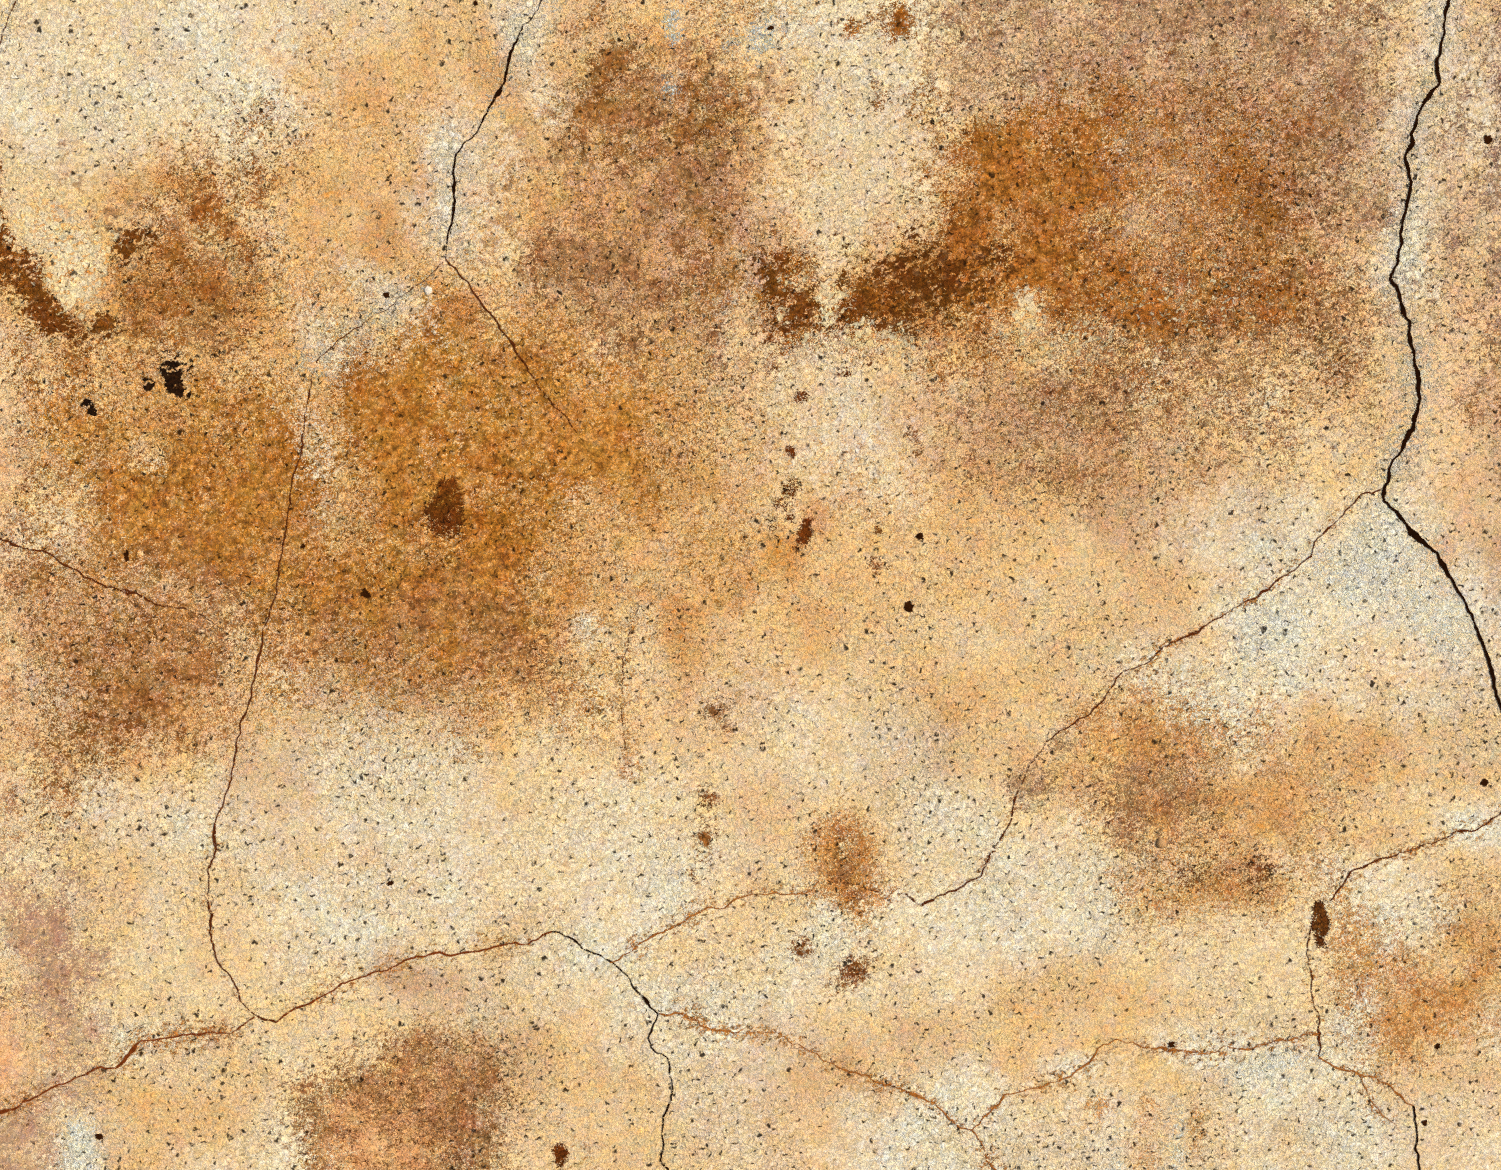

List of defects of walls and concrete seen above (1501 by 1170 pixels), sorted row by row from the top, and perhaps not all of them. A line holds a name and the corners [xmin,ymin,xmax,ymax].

crack [0,0,31,66]
crack [422,0,577,433]
corrosion [0,29,1444,788]
corrosion [837,0,921,54]
crack [828,0,1501,908]
crack [0,262,1421,1170]
corrosion [784,933,815,963]
corrosion [790,792,901,1005]